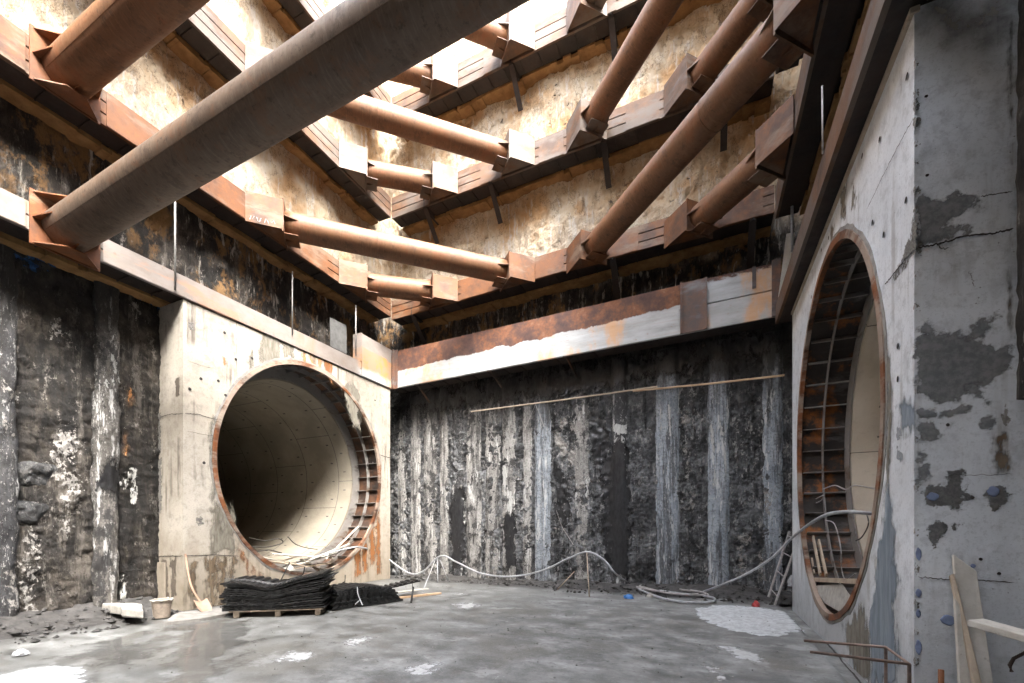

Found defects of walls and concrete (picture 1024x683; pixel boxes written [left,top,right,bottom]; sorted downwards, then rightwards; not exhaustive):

spalling [912,89,921,147]
crack [885,228,1013,284]
damp [46,423,138,539]
corrosion [993,432,1010,473]
corrosion [354,511,381,577]
damp [448,487,466,575]
damp [502,464,517,570]